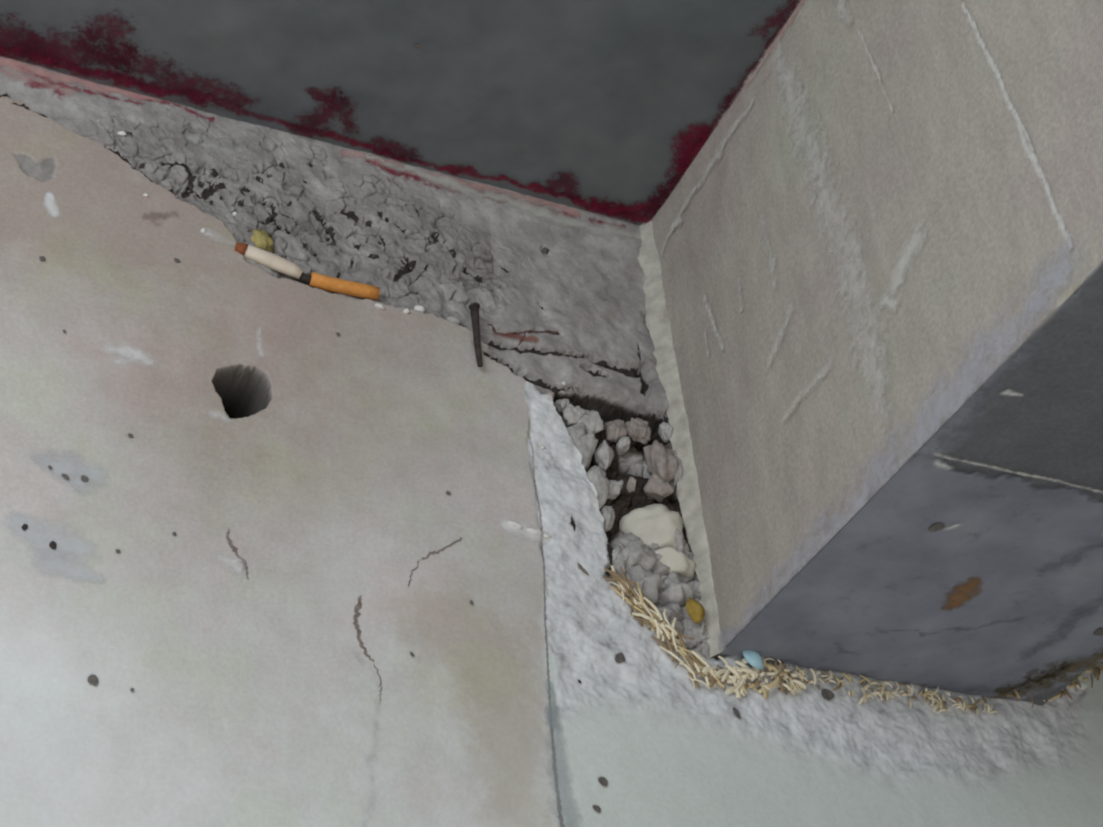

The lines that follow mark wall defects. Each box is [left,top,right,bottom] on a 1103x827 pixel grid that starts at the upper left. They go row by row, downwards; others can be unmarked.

water stain [21,68,214,120]
water stain [45,193,59,217]
water stain [366,154,642,240]
flaking render [0,62,753,670]
crack [483,324,669,452]
crack [226,528,249,580]
crack [408,537,463,587]
peeling [520,381,1103,807]
corrosion [943,578,981,610]
crack [353,595,382,699]